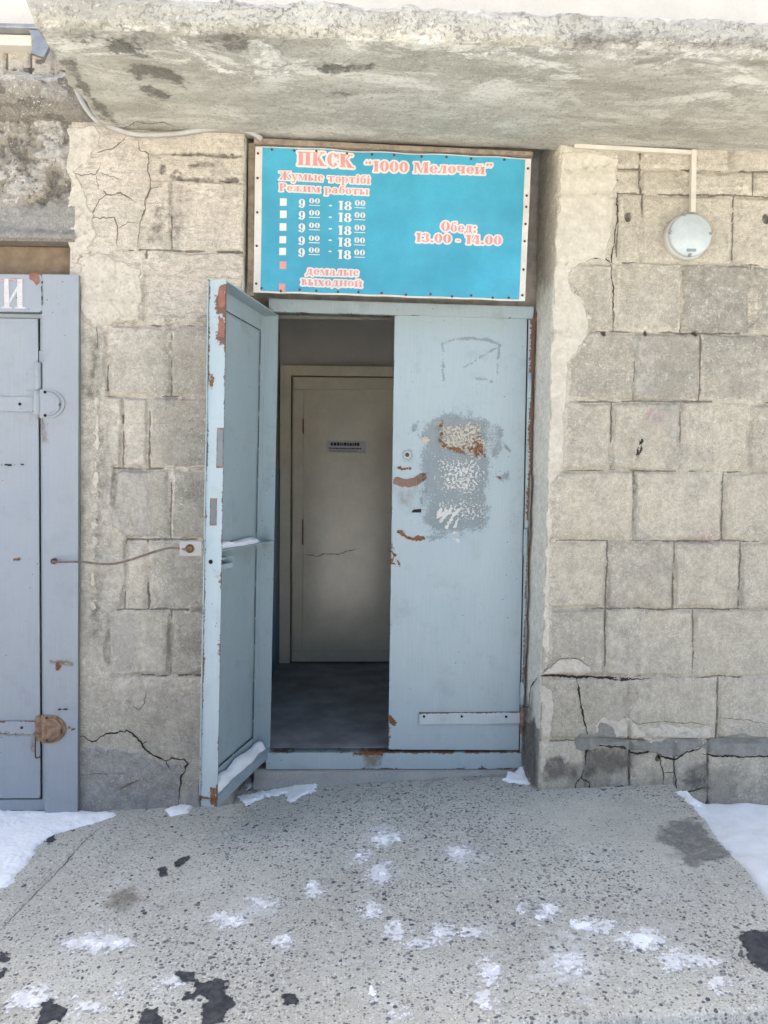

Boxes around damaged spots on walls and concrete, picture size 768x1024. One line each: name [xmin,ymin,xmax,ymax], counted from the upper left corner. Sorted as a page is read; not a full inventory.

crack [75,122,174,245]
rust [393,466,427,487]
rust [397,530,426,541]
peeling [431,420,490,543]
crack [80,696,189,804]
crack [523,674,768,793]